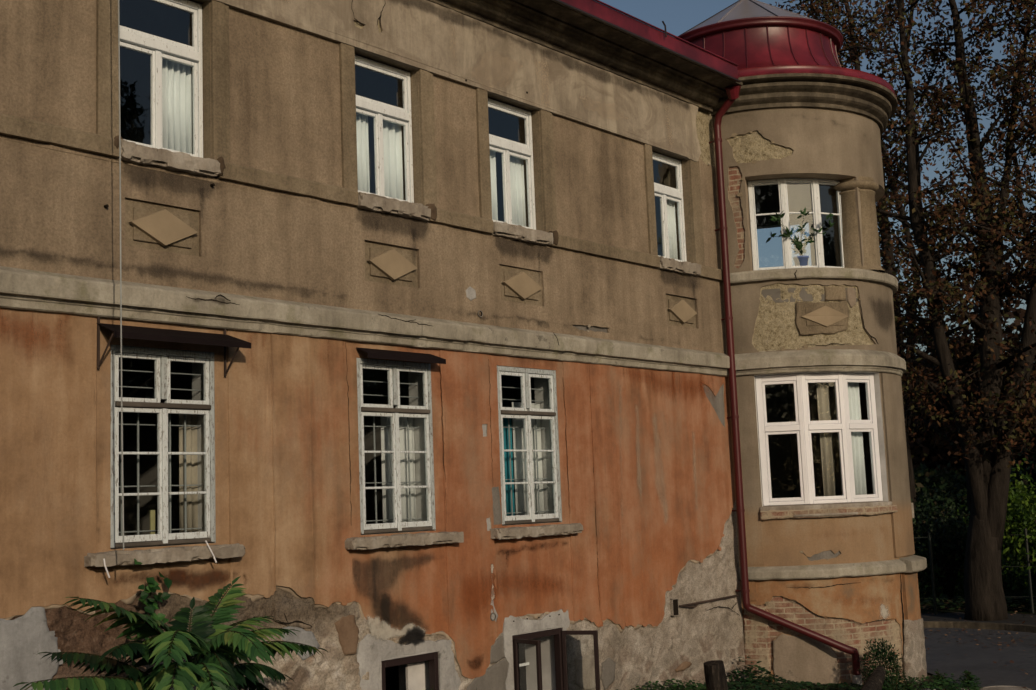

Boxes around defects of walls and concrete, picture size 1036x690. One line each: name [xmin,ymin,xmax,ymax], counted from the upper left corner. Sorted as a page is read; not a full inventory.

crack [352,0,386,32]
spalling [696,108,715,167]
spalling [727,131,793,269]
crack [186,294,239,305]
spalling [752,283,874,351]
water stain [358,561,425,640]
spalling [518,500,927,690]
spalling [0,586,372,690]
spalling [398,664,406,690]
spalling [424,631,475,690]